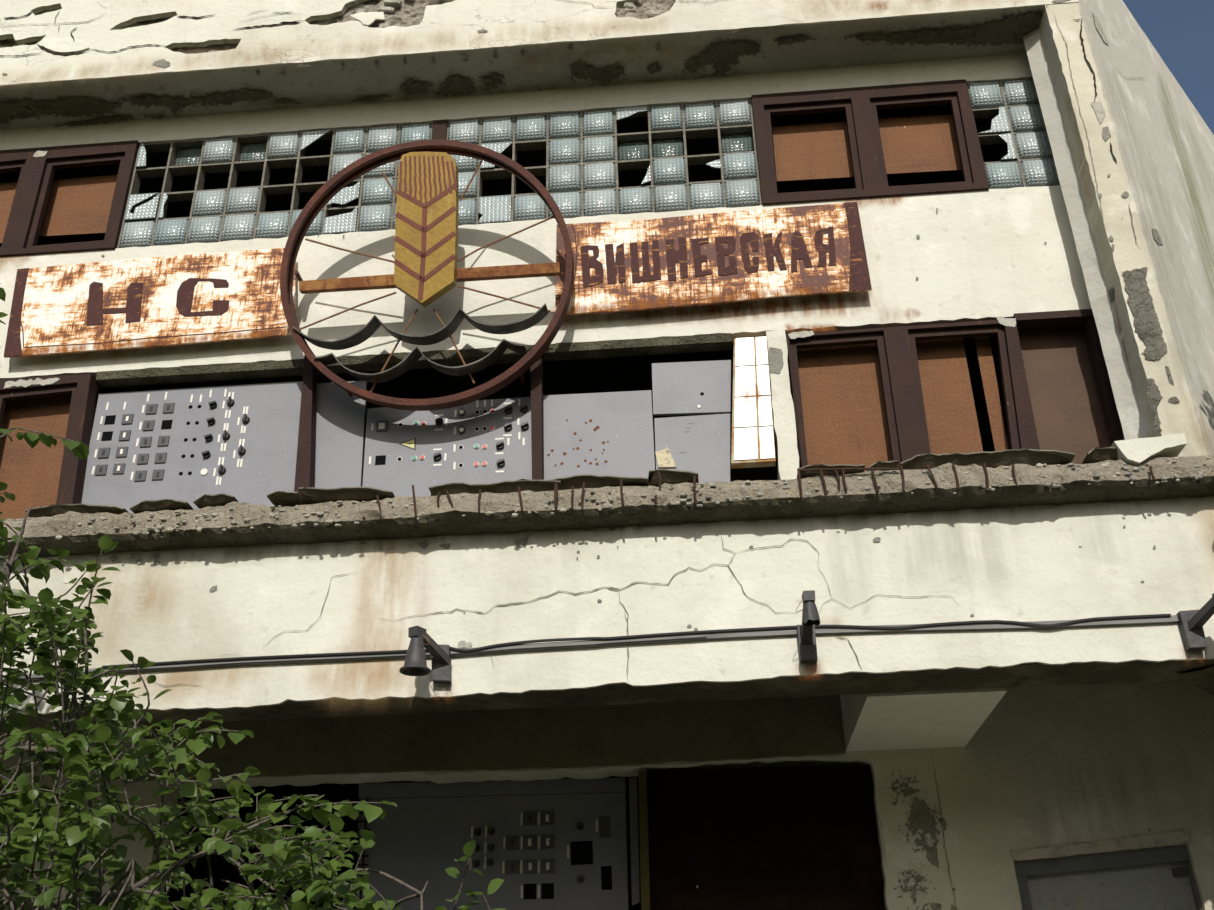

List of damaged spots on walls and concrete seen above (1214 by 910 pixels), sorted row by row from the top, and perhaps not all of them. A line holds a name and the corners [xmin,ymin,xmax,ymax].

spalling [31,3,62,15]
spalling [110,11,177,30]
spalling [305,0,454,28]
spalling [615,0,675,19]
spalling [0,34,46,48]
spalling [153,39,241,68]
crack [1053,12,1140,248]
peeling [1108,267,1180,433]
spalling [797,465,905,498]
crack [265,572,353,646]
crack [378,536,957,680]
peeling [887,770,956,910]